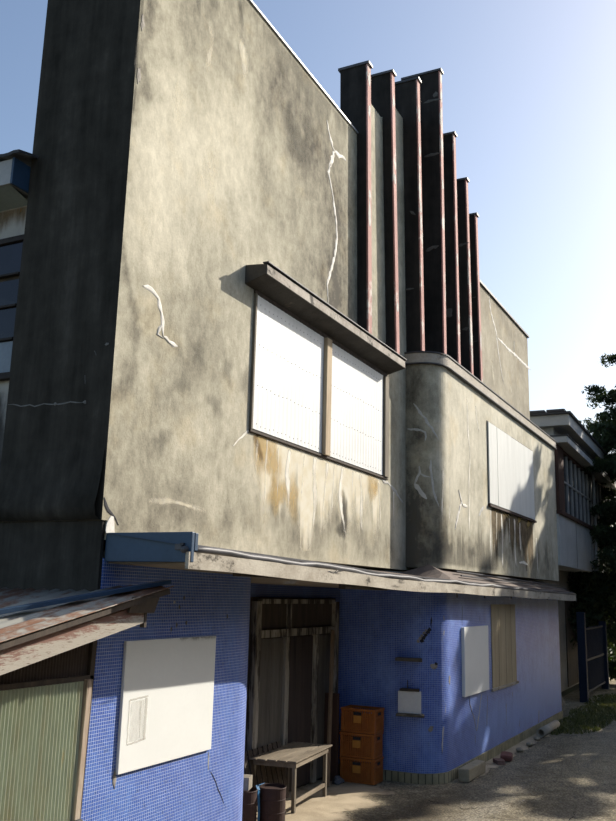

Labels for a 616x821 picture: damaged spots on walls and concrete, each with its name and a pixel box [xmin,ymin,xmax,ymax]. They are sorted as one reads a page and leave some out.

crack [326,120,346,304]
crack [143,285,178,347]
crack [472,297,531,383]
crack [407,403,439,440]
crack [383,460,439,515]
crack [455,490,484,529]